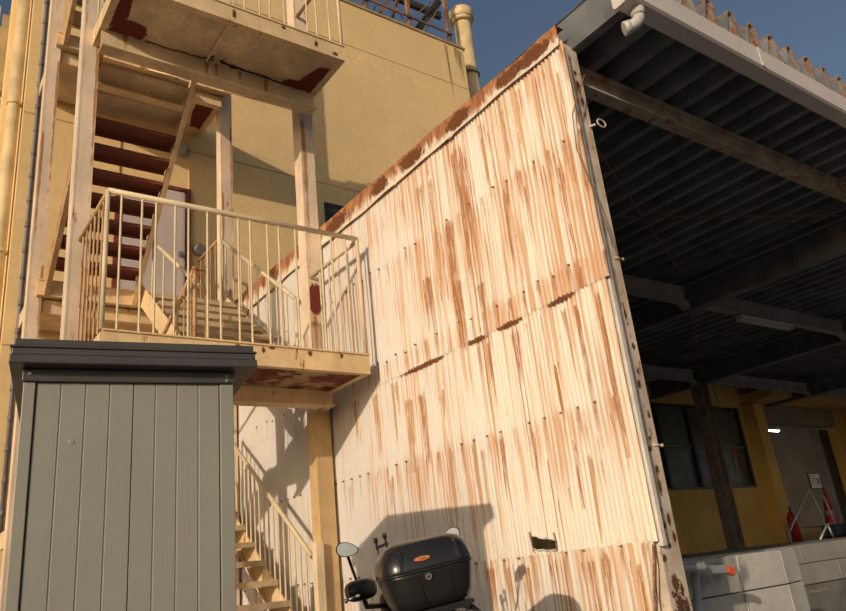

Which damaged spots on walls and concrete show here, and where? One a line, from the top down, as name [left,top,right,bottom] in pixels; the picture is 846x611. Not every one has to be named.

corrosion [108,0,147,46]
crack [144,40,284,85]
corrosion [495,35,551,90]
corrosion [189,104,213,129]
corrosion [445,104,471,134]
corrosion [399,143,425,171]
corrosion [308,283,323,356]
corrosion [416,147,572,611]
corrosion [547,291,593,401]
corrosion [595,294,626,435]
corrosion [391,356,445,511]
corrosion [568,456,614,611]